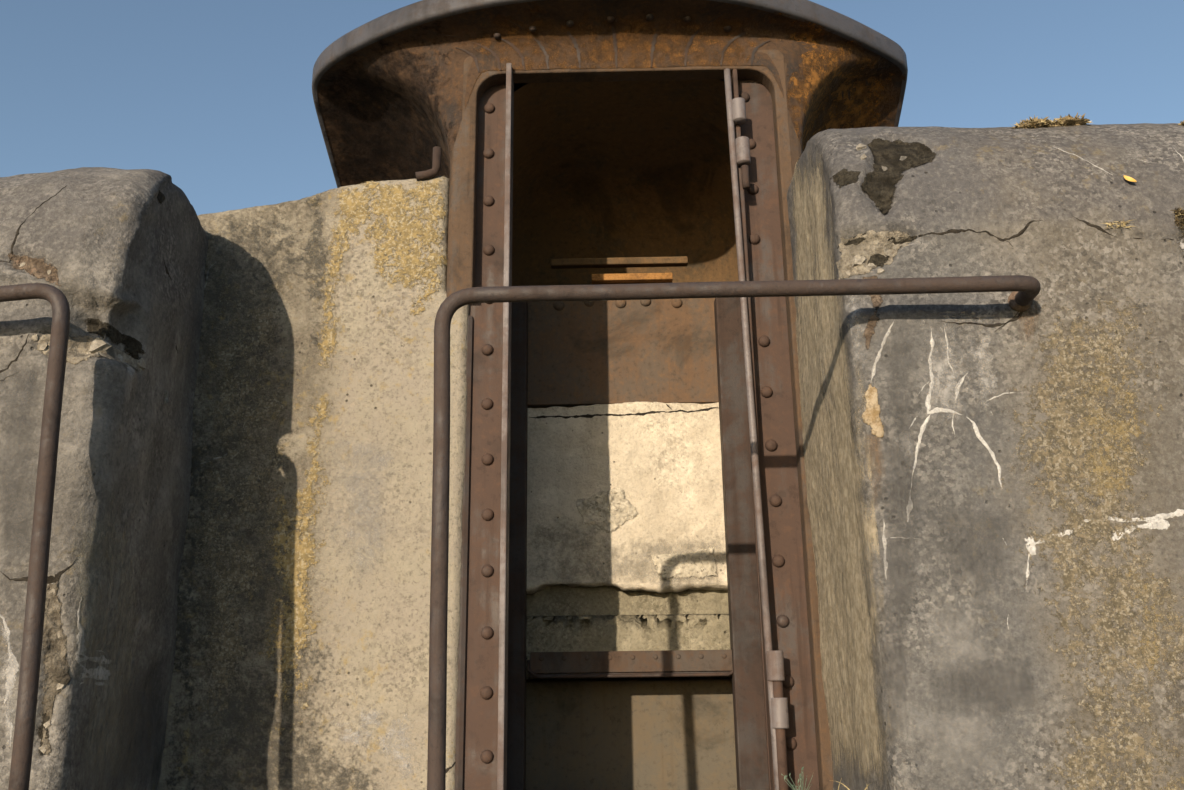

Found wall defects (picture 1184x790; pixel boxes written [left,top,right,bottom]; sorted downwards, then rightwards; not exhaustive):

corrosion [316,26,455,185]
corrosion [772,12,904,153]
spalling [830,138,936,214]
spalling [831,230,926,279]
crack [926,220,1041,246]
crack [1073,216,1181,240]
spalling [31,334,51,356]
spalling [66,318,146,372]
crack [529,404,718,419]
crack [884,311,1023,539]
crack [1002,509,1184,585]
damp [257,475,330,740]